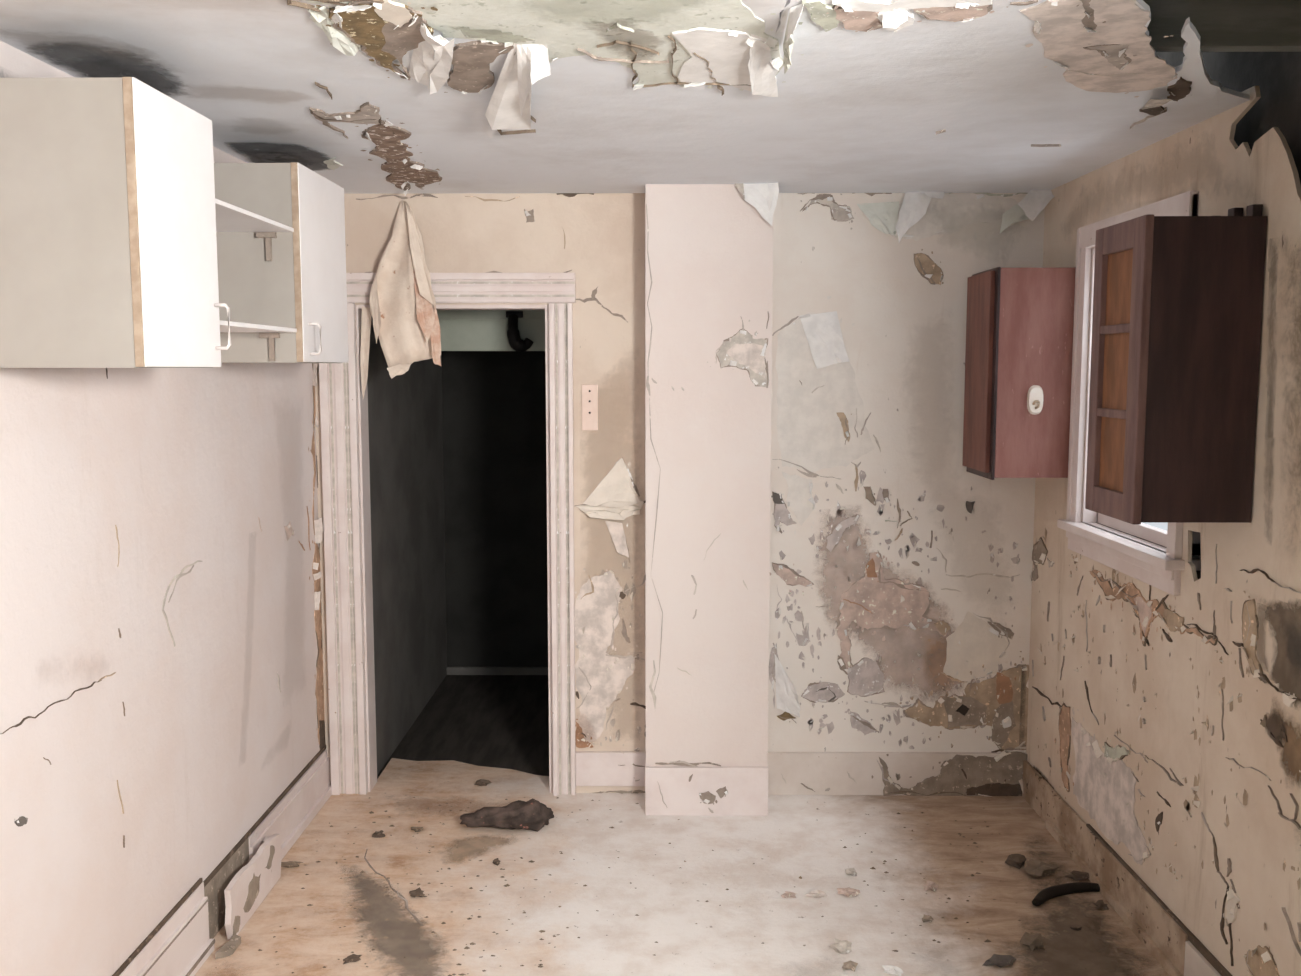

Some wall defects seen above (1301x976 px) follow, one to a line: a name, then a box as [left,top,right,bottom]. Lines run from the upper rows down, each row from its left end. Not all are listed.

peeling [301,0,1192,135]
spalling [309,82,442,196]
crack [113,525,121,567]
peeling [575,457,646,751]
spalling [707,296,1301,882]
crack [0,672,125,734]
crack [1033,600,1181,786]
crack [1197,544,1301,846]
crack [117,780,125,848]
crack [1201,812,1240,966]
spalling [1239,939,1280,976]
crack [1281,907,1301,956]